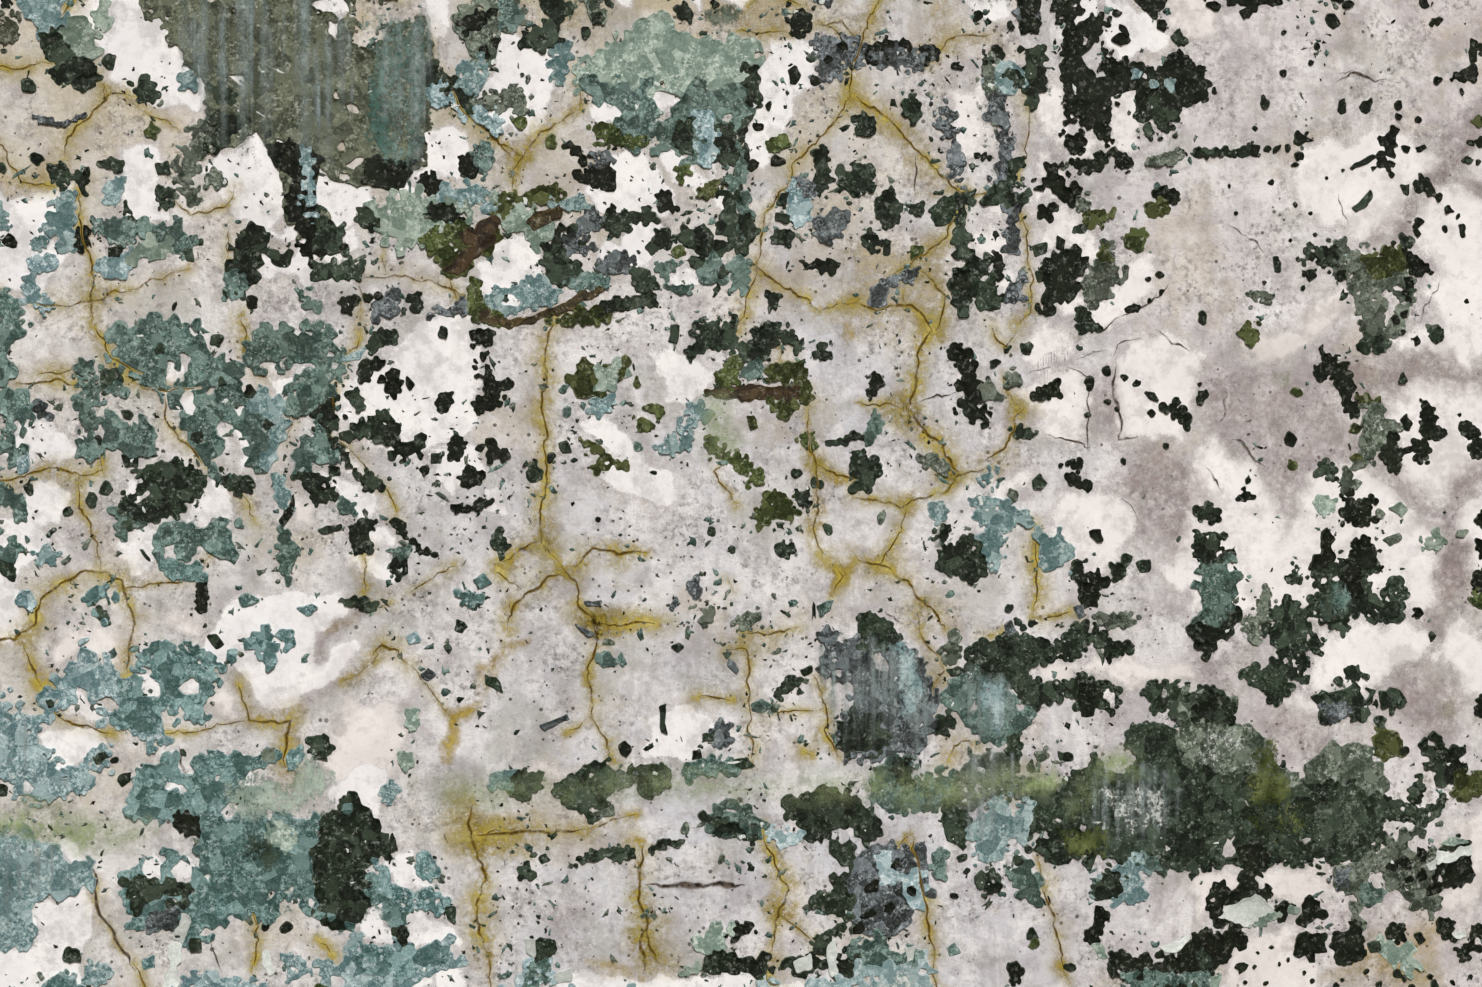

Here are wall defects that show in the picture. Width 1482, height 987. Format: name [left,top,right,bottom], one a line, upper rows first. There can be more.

crack [0,144,203,465]
crack [737,0,1188,688]
crack [0,456,181,674]
peeling [0,0,941,987]
crack [498,318,655,755]
peeling [485,0,1482,987]
crack [90,854,146,987]
crack [166,682,291,770]
crack [444,804,744,987]
crack [698,628,839,758]
crack [900,836,937,987]
water stain [1093,764,1164,827]